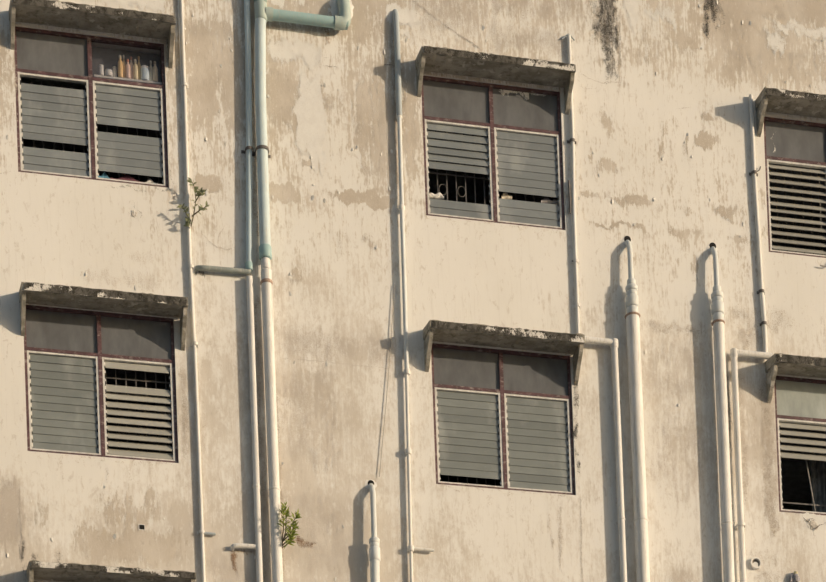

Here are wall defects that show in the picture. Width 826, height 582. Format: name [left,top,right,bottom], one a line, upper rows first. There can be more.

leakage [13,0,175,23]
leakage [586,0,678,84]
leakage [698,0,725,39]
leakage [765,18,826,58]
peeling [266,69,298,134]
leakage [766,88,826,102]
peeling [311,74,421,211]
peeling [269,181,300,204]